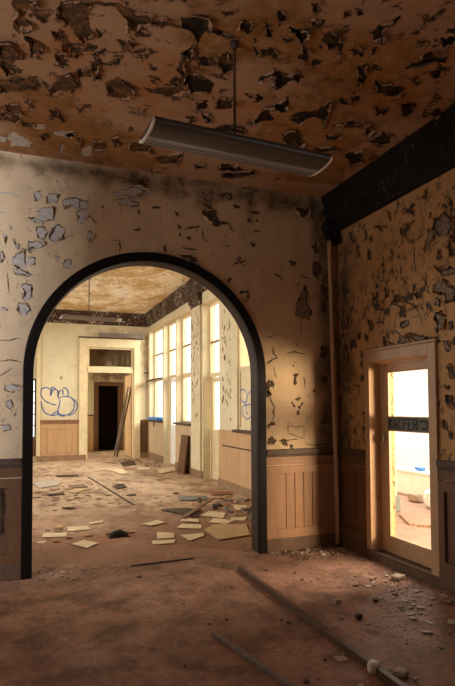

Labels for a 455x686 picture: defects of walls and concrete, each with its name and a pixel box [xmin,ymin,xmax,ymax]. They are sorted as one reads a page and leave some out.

peeling [0,0,455,167]
peeling [113,185,151,214]
peeling [217,164,259,193]
peeling [0,190,89,315]
peeling [295,285,312,333]
peeling [337,198,455,410]
peeling [191,311,199,404]
peeling [266,369,276,426]
peeling [268,436,293,449]